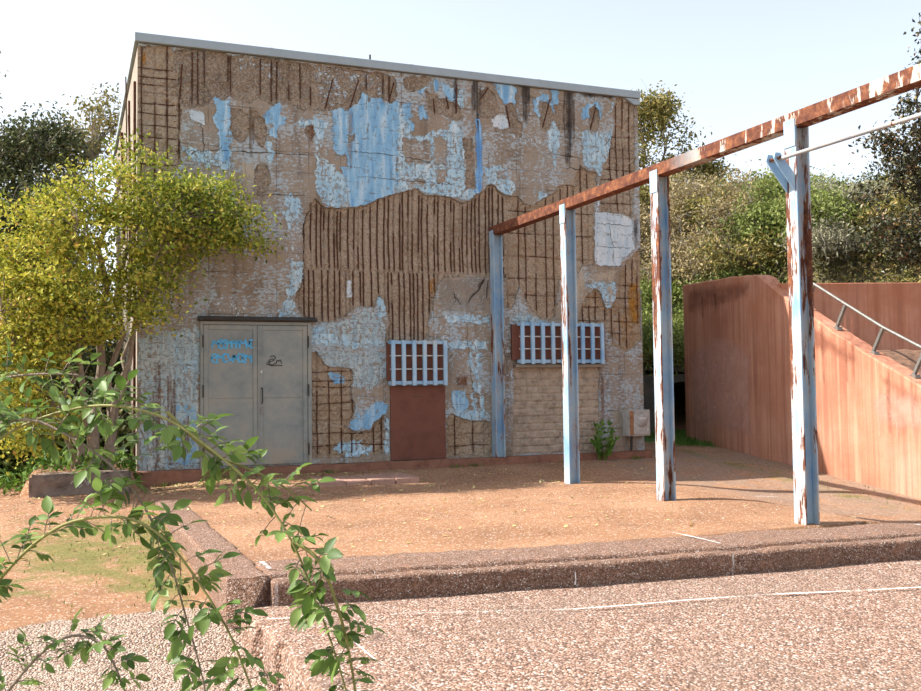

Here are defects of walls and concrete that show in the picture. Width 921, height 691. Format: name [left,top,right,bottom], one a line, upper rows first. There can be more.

spalling [137,46,642,471]